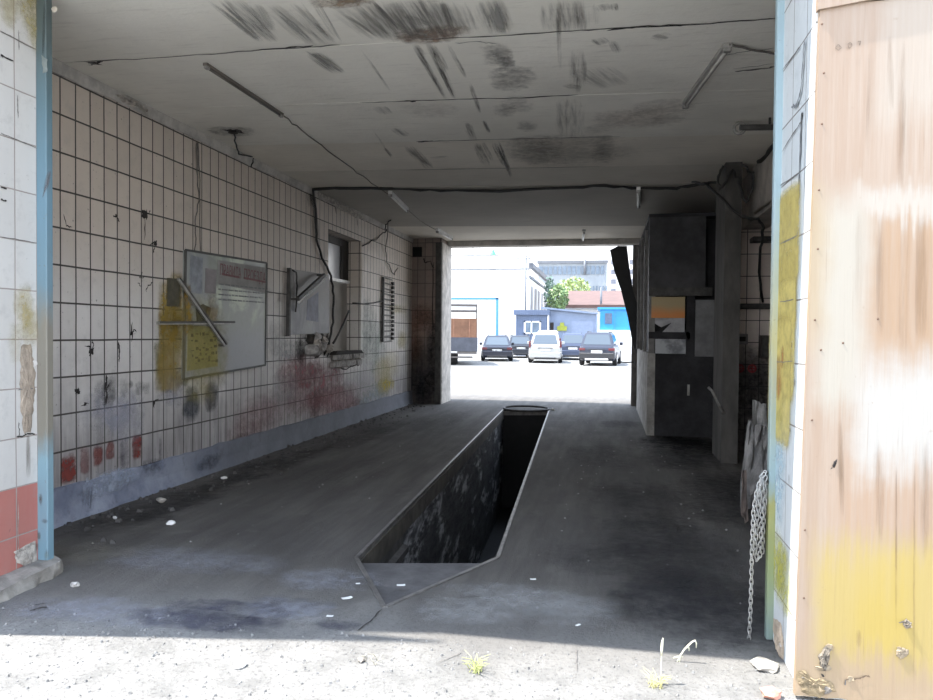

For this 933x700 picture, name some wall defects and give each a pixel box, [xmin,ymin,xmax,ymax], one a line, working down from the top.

spalling [17,344,38,437]
spalling [14,509,37,566]
spalling [796,644,836,698]